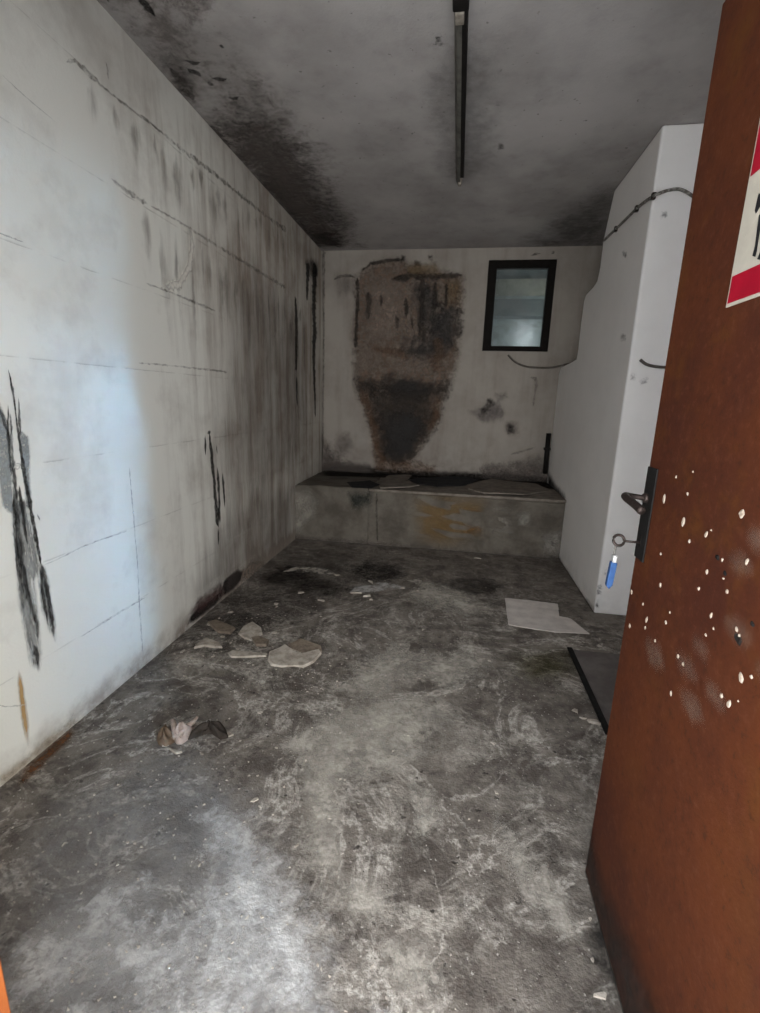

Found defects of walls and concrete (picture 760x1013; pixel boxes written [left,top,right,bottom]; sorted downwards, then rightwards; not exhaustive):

leakage [149,3,226,100]
leakage [210,94,351,247]
leakage [322,256,564,498]
peeling [0,370,54,667]